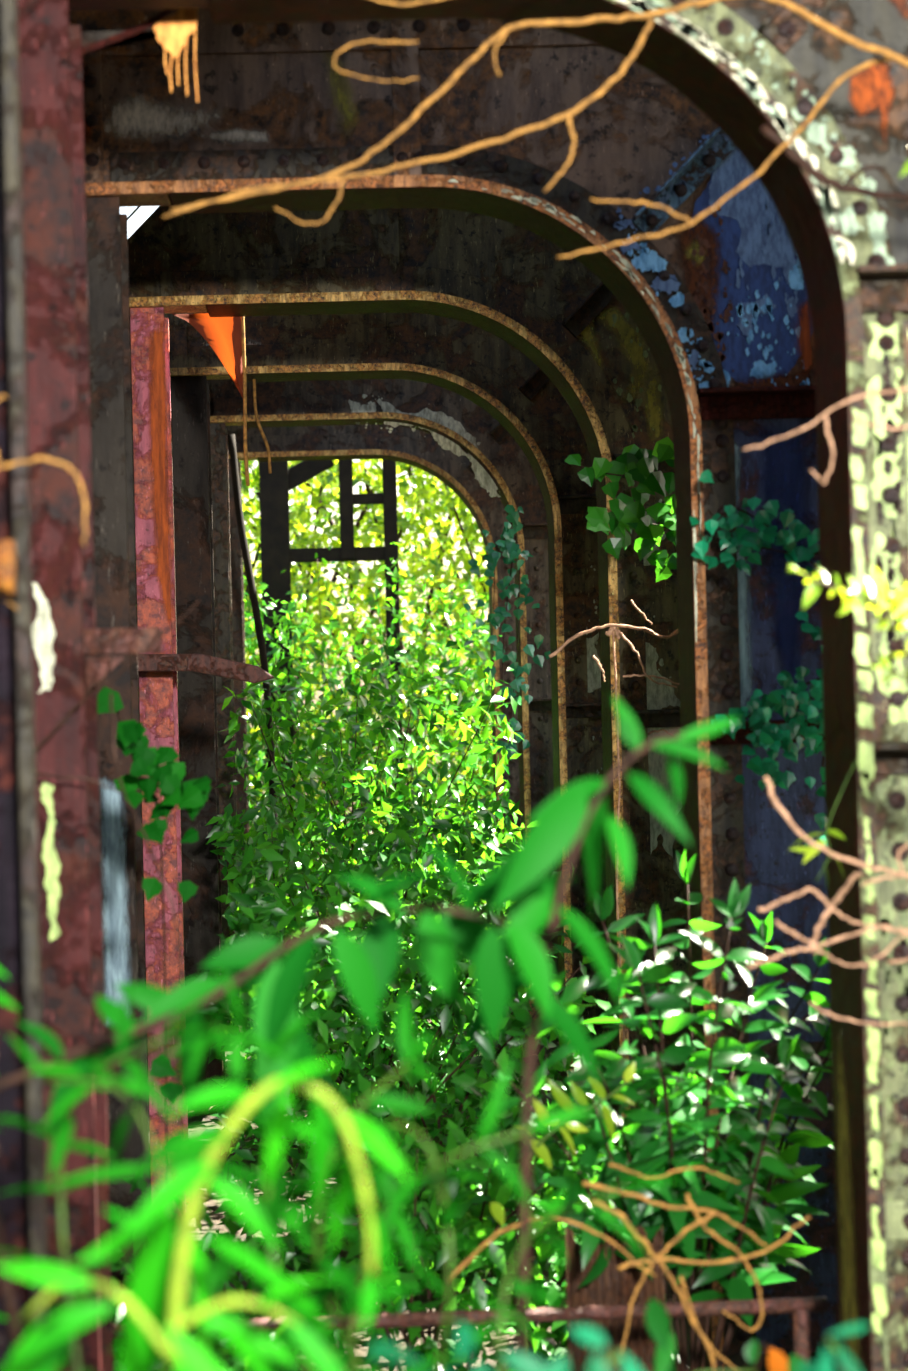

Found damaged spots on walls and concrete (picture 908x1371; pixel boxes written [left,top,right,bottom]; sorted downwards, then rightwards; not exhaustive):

peeling [617,0,895,265]
corrosion [850,64,893,128]
peeling [482,132,813,642]
peeling [586,600,601,693]
peeling [646,642,680,710]
peeling [648,727,684,881]
peeling [850,321,908,1349]